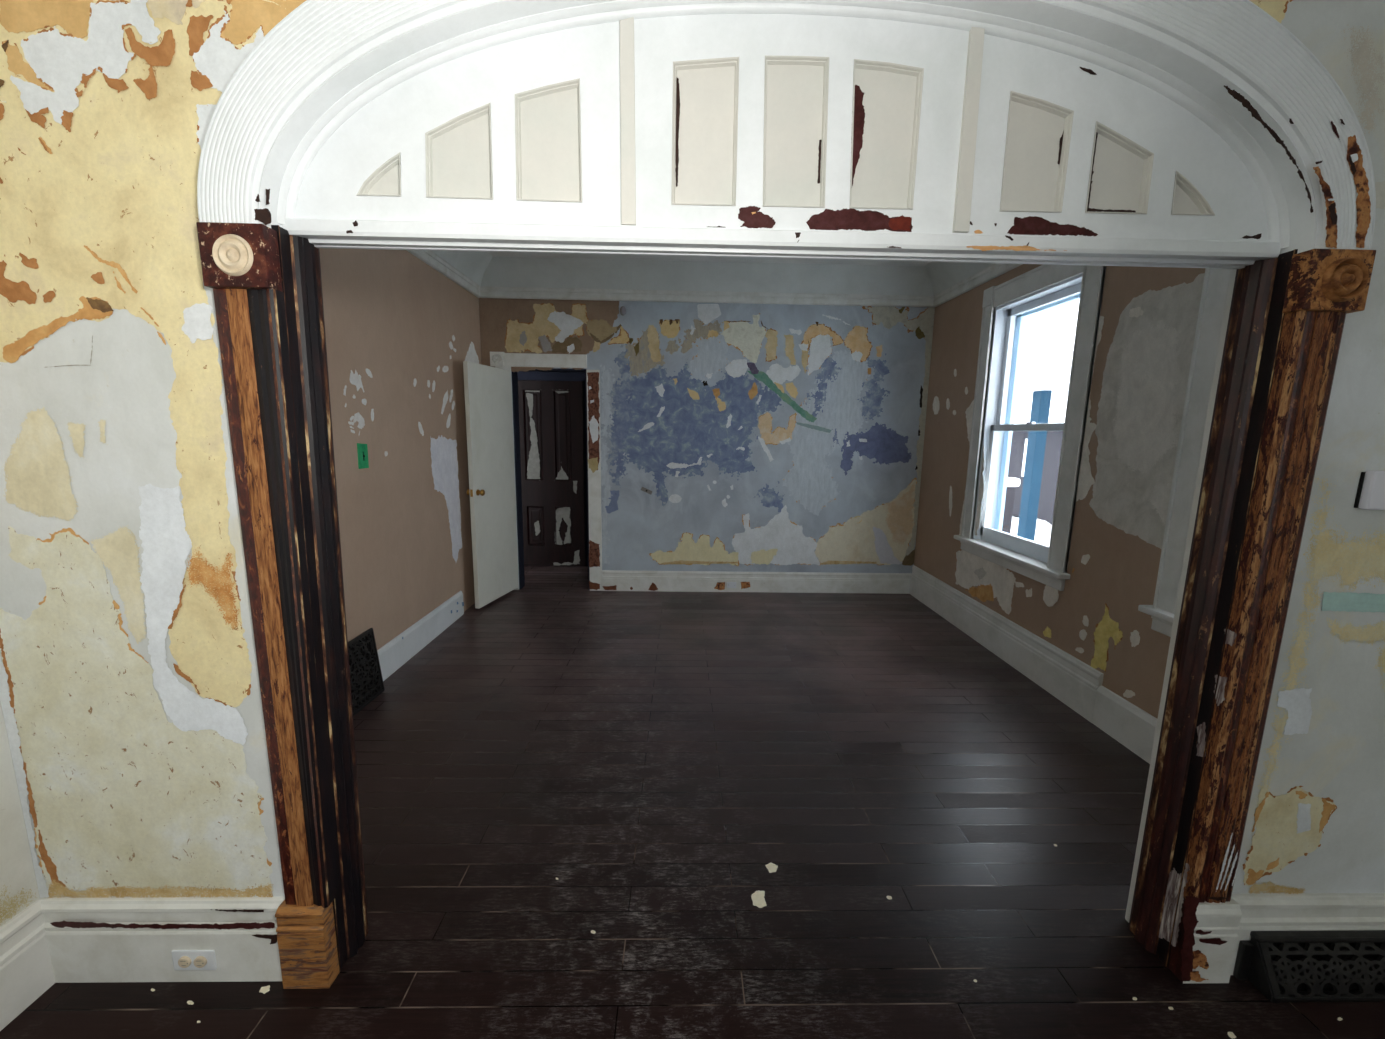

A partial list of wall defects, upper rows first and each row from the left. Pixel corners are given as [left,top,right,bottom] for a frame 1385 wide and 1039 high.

peeling [0,0,175,132]
peeling [192,0,306,149]
peeling [1224,85,1337,224]
peeling [1331,119,1358,175]
peeling [254,189,272,225]
peeling [708,206,776,228]
peeling [795,208,913,248]
peeling [525,389,658,591]
peeling [587,372,600,473]
peeling [714,334,917,590]
peeling [50,909,277,944]
peeling [1196,930,1227,945]